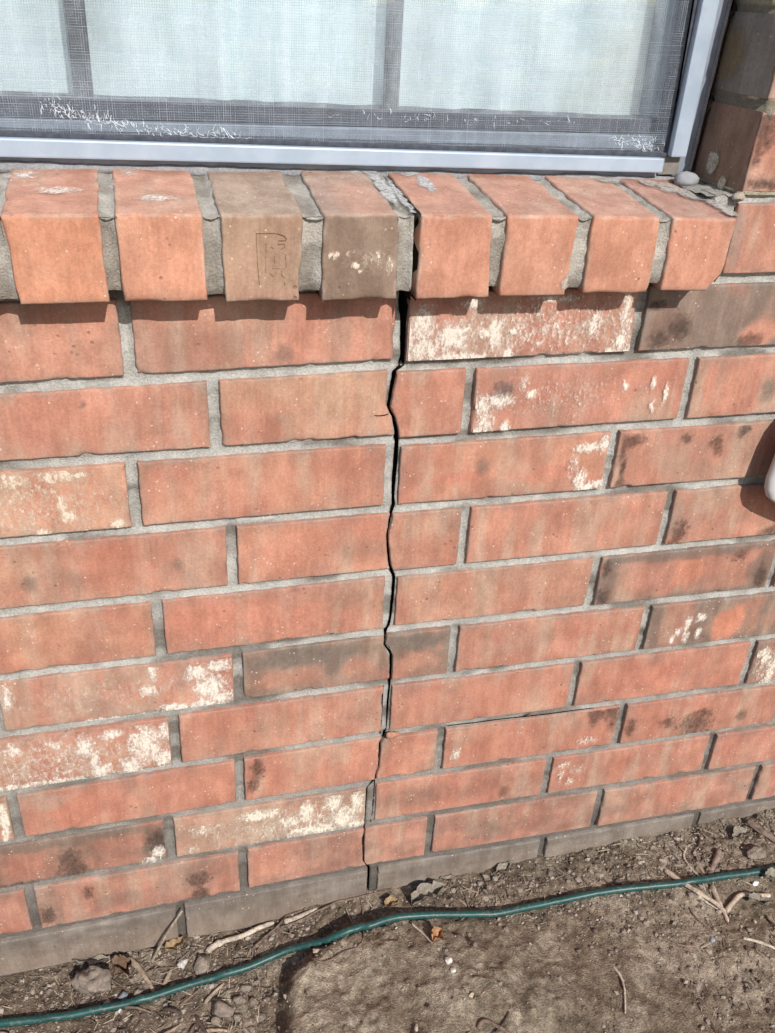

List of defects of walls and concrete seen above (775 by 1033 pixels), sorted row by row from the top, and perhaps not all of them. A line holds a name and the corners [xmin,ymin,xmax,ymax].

leakage [408,293,633,361]
leakage [473,377,562,433]
leakage [568,435,609,490]
leakage [0,471,111,535]
crack [362,186,421,890]
leakage [756,647,775,683]
leakage [0,658,233,791]
leakage [0,804,12,842]
leakage [188,791,364,853]